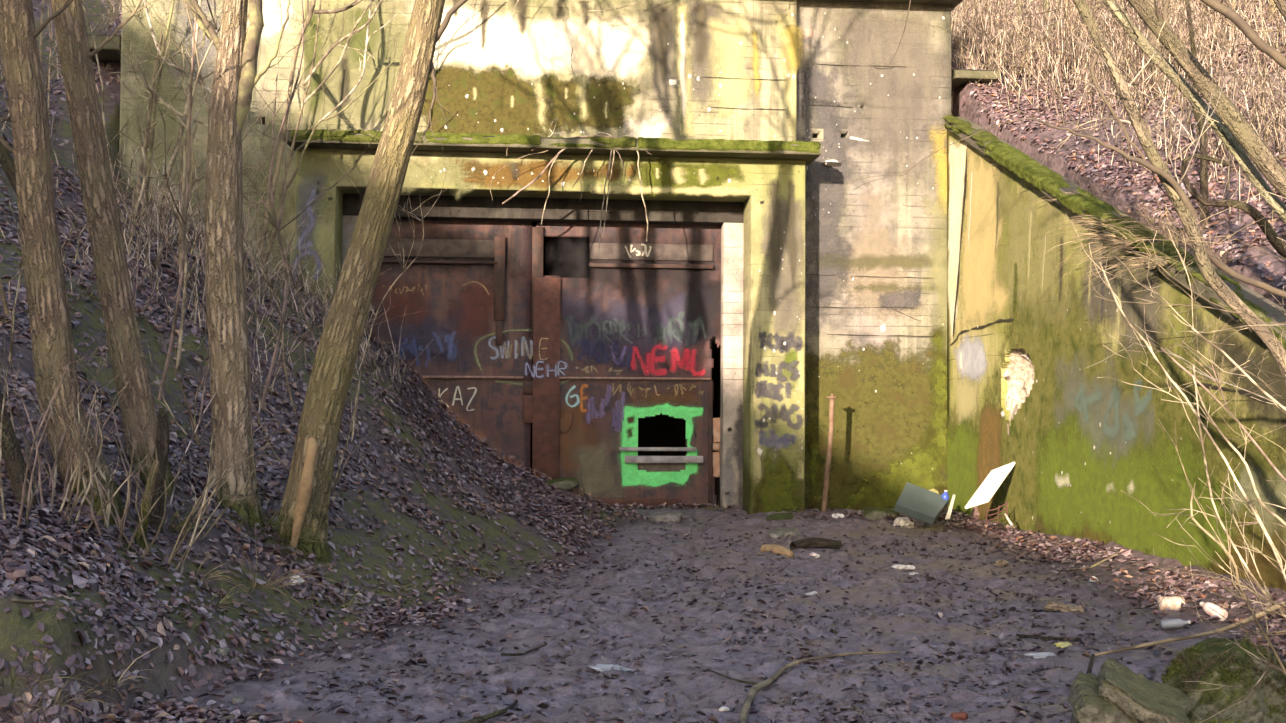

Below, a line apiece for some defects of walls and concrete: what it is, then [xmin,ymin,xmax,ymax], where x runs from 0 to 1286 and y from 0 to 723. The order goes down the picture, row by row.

damp [433,0,760,139]
damp [590,8,1063,464]
damp [1084,233,1161,346]
rust [632,386,699,406]
damp [722,333,778,505]
damp [798,414,822,494]
spalling [1001,348,1034,435]
damp [1195,318,1286,429]
damp [1236,468,1286,522]